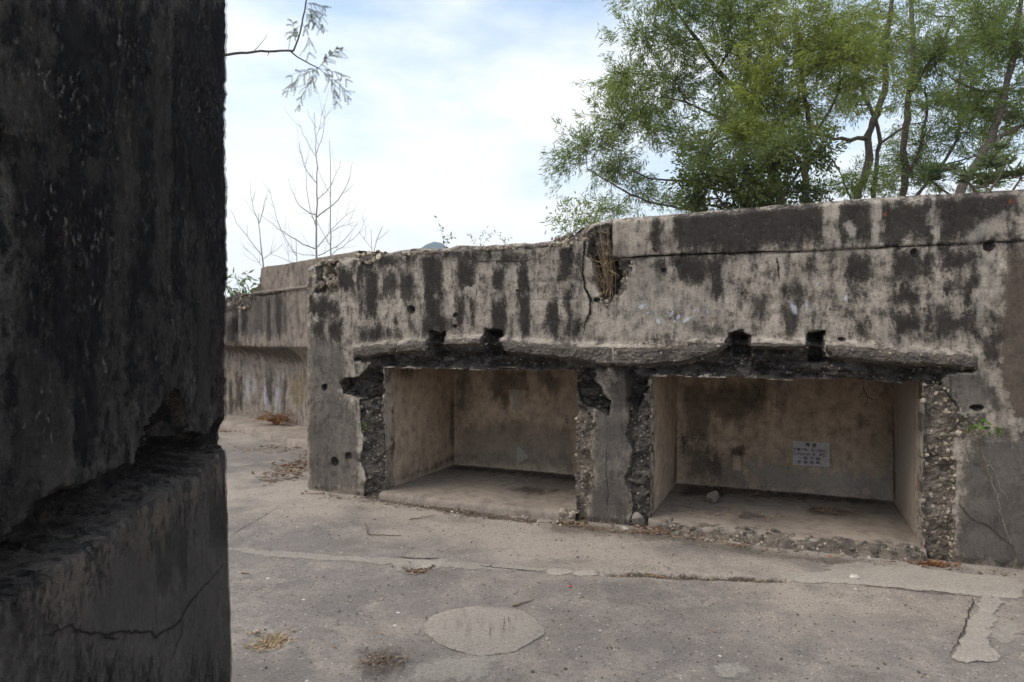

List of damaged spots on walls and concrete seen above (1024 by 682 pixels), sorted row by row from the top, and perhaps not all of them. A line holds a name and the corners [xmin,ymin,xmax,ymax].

water stain [15,0,158,475]
spalling [0,400,220,542]
water stain [0,452,232,672]
crack [24,505,229,661]
water stain [172,0,227,306]
spalling [312,259,340,295]
water stain [224,246,583,492]
spalling [331,312,984,563]
crack [576,222,800,337]
water stain [650,202,824,302]
water stain [837,191,1024,417]
crack [960,432,1016,556]